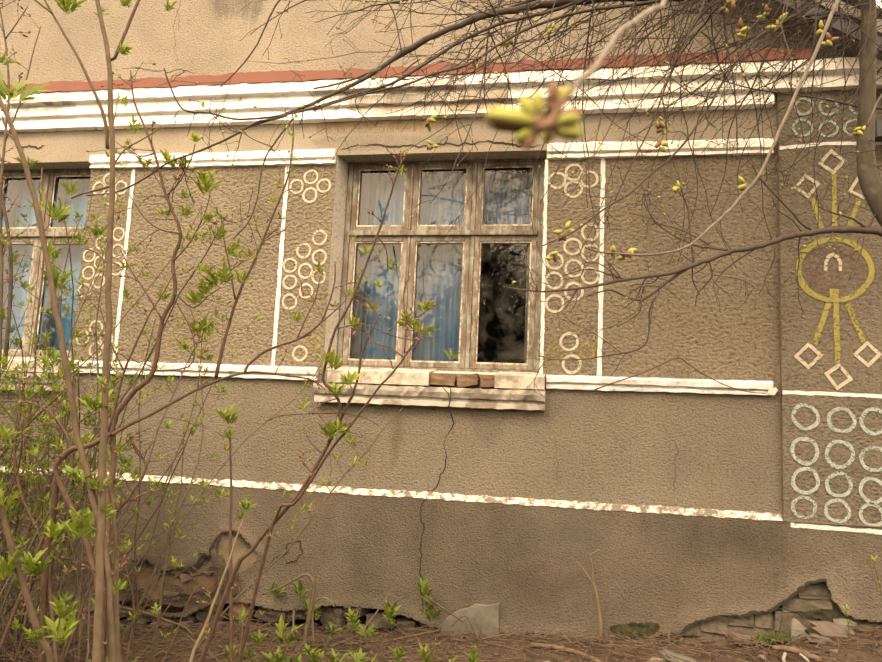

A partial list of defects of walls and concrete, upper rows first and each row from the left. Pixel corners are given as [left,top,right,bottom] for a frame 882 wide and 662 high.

crack [419,387,454,610]
crack [119,530,252,603]
spalling [121,530,263,619]
crack [264,540,303,570]
spalling [657,582,882,643]